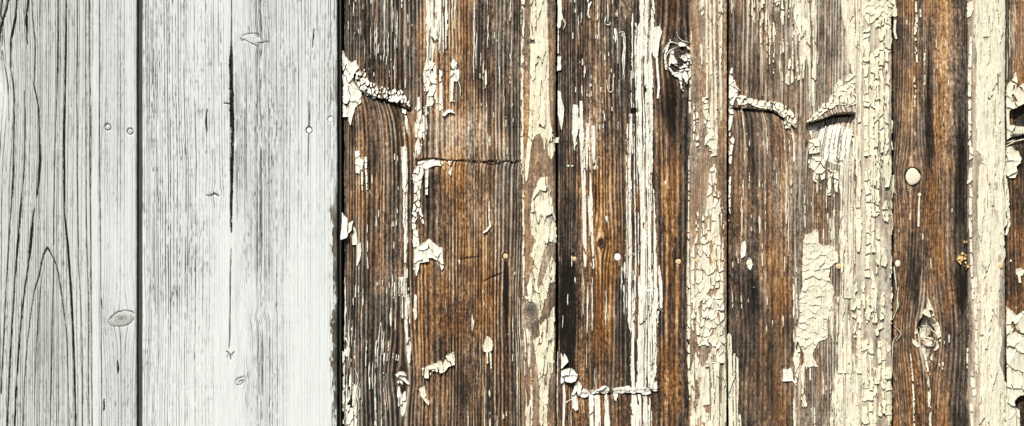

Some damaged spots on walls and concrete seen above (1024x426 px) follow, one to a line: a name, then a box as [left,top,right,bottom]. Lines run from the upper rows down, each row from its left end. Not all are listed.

crack [205,0,264,313]
peeling [340,0,462,426]
crack [418,157,518,165]
peeling [483,0,950,426]
peeling [957,0,1024,426]